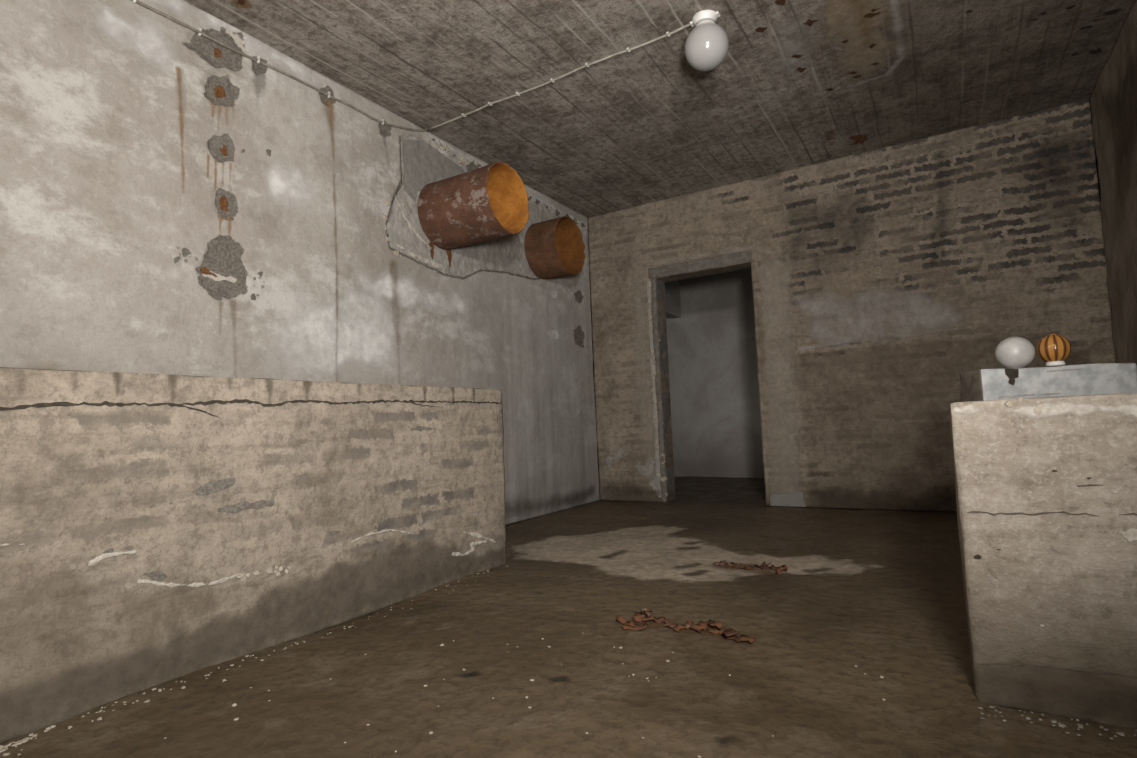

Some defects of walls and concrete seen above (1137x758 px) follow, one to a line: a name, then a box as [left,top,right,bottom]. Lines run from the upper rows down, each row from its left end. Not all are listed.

spalling [183,27,267,112]
corrosion [824,0,902,84]
spalling [174,134,265,301]
corrosion [429,242,452,267]
crack [0,399,502,418]
crack [967,484,1137,516]